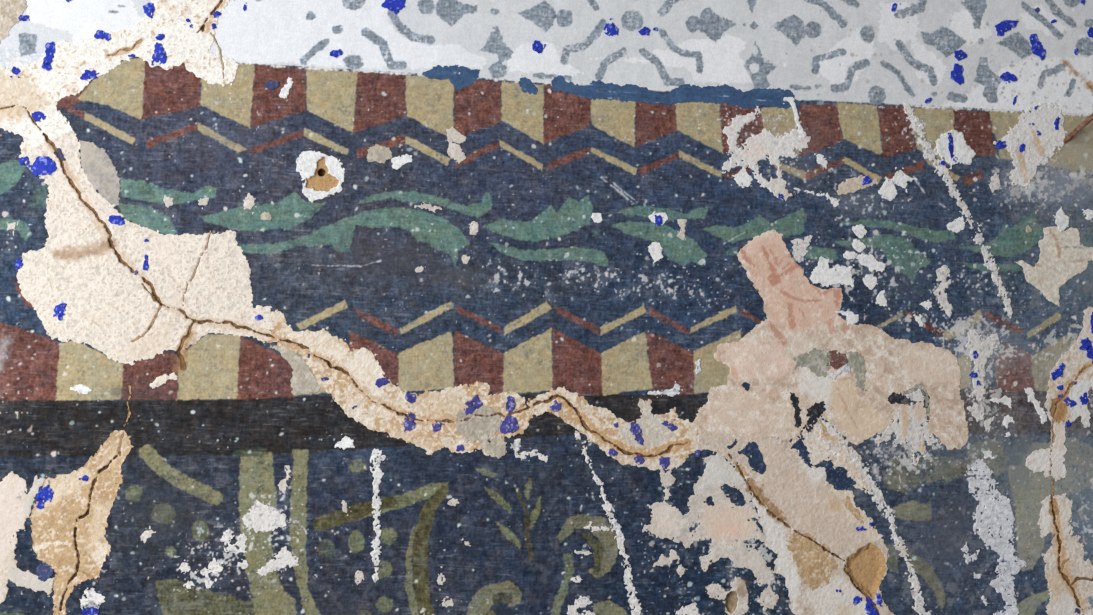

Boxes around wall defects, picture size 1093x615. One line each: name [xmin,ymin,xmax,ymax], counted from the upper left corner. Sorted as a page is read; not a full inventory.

peeling [0,0,533,459]
crack [0,104,684,457]
water stain [903,103,1013,319]
spalling [0,430,134,615]
crack [59,385,131,614]
water stain [369,449,384,583]
water stain [575,431,643,615]
peeling [527,230,969,615]
crack [728,454,880,615]
water stain [961,459,1029,615]
peeling [1037,493,1093,615]
crack [1049,363,1093,610]